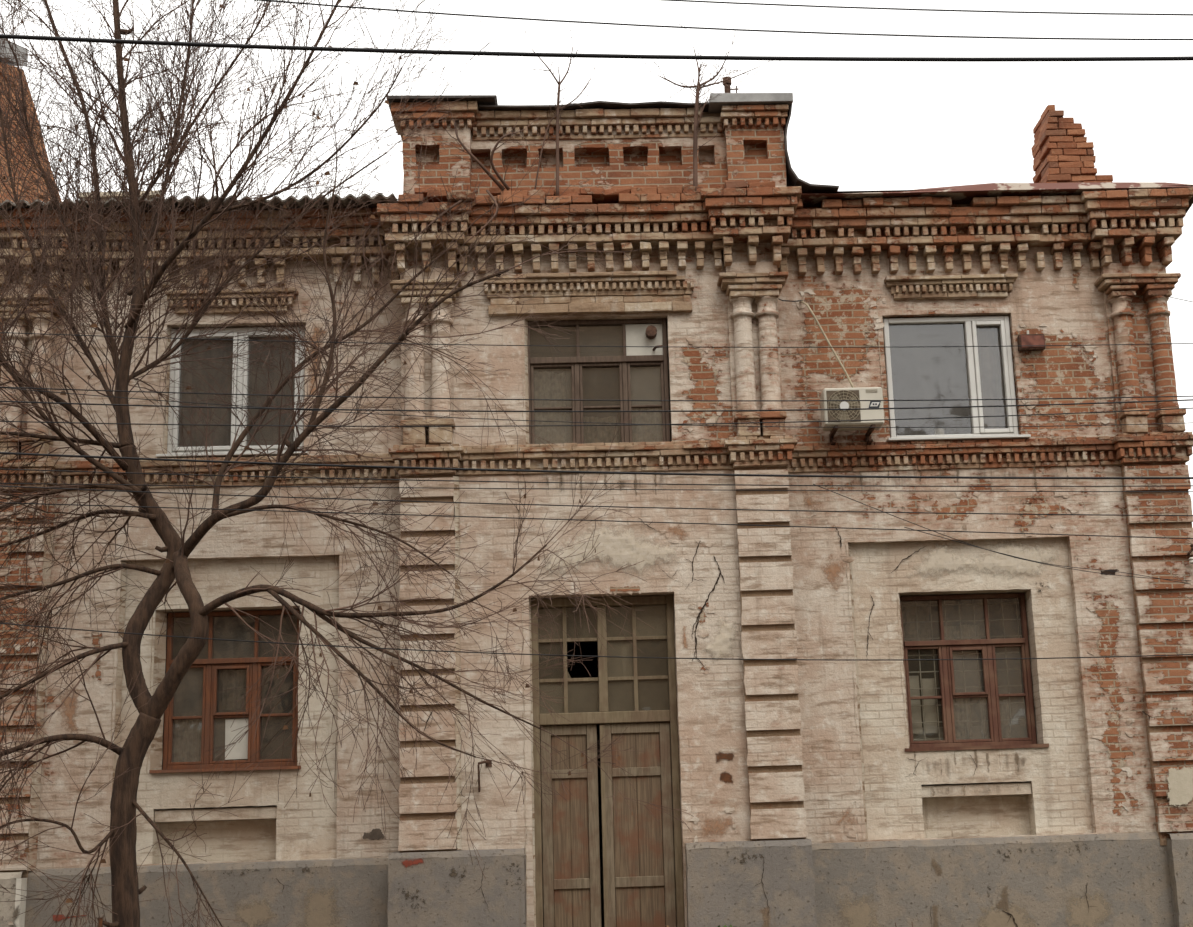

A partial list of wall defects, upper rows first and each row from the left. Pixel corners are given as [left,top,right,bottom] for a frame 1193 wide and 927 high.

peeling [679,338,724,432]
peeling [793,284,887,421]
peeling [1016,322,1109,425]
peeling [0,508,34,576]
peeling [0,603,35,653]
crack [654,542,726,667]
peeling [1086,601,1135,816]